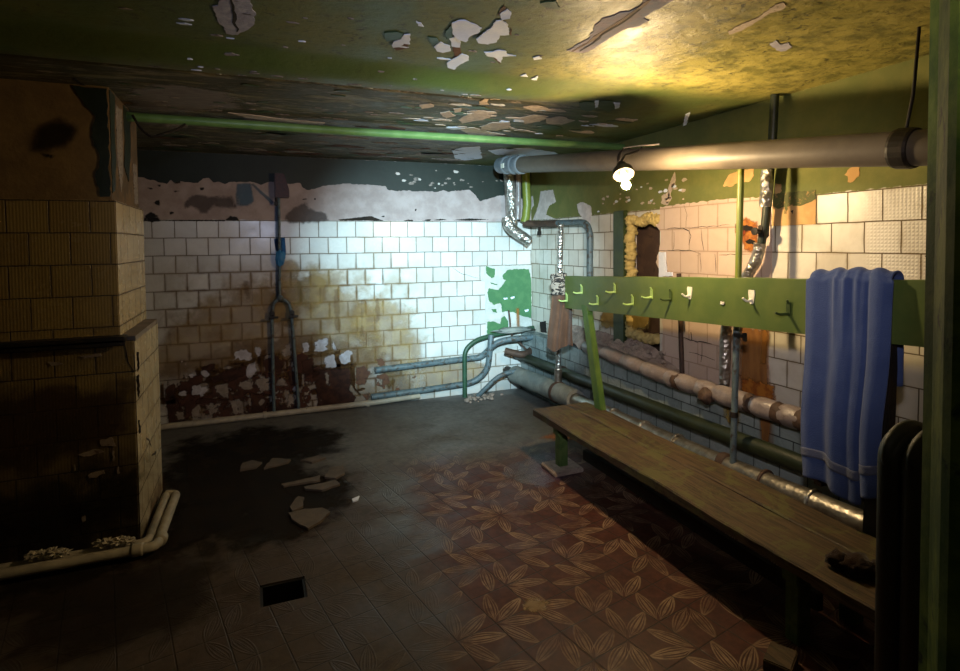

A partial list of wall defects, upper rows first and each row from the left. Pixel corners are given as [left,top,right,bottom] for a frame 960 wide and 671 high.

peeling [540,0,560,10]
peeling [384,31,410,59]
peeling [416,6,519,70]
peeling [73,83,638,220]
peeling [577,172,687,224]
peeling [723,169,754,187]
peeling [772,183,816,226]
peeling [845,167,860,183]
spalling [165,338,400,423]
rust [725,327,784,442]